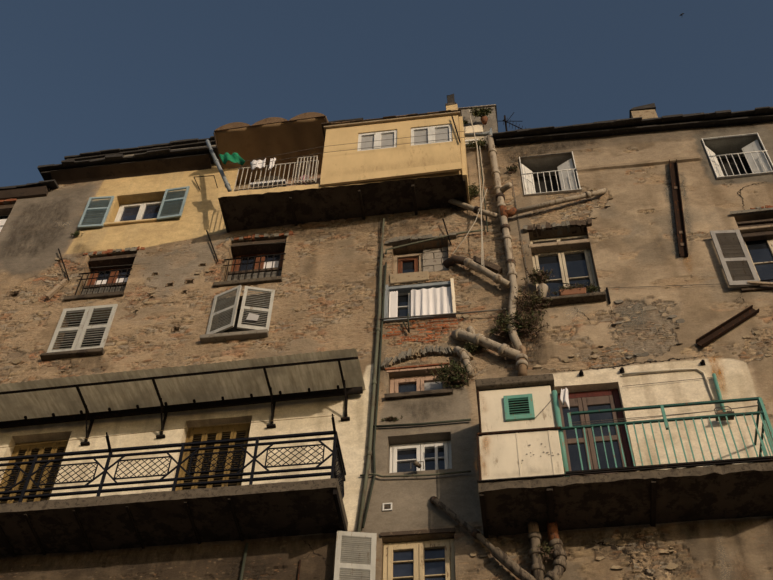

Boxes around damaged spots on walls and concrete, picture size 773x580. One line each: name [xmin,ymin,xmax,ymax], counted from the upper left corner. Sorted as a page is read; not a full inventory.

flaking render [6,257,80,308]
flaking render [181,242,228,294]
flaking render [12,346,73,372]
flaking render [374,311,470,345]
flaking render [531,300,685,372]